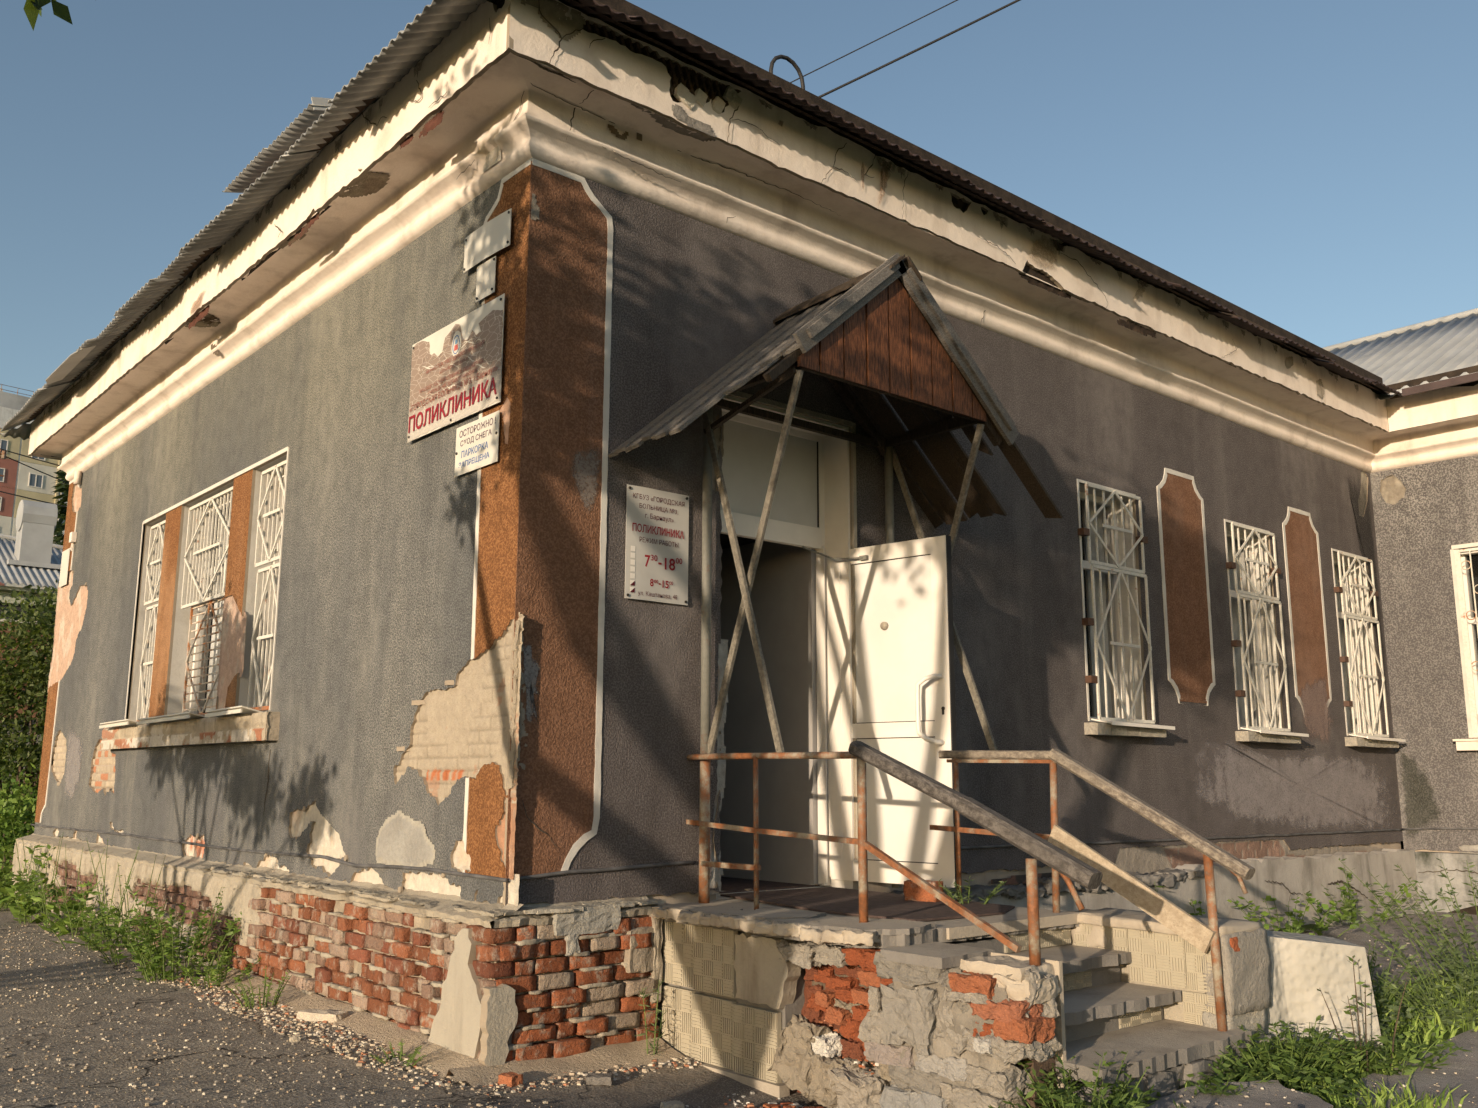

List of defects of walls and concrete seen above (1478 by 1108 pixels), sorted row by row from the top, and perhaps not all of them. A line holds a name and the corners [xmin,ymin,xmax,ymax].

crack [488,0,908,218]
spalling [339,169,390,198]
peeling [47,570,88,693]
spalling [53,731,67,786]
spalling [91,740,116,793]
spalling [184,596,880,947]
leakage [1198,680,1389,828]
flaking render [46,860,98,915]
flaking render [130,879,241,967]